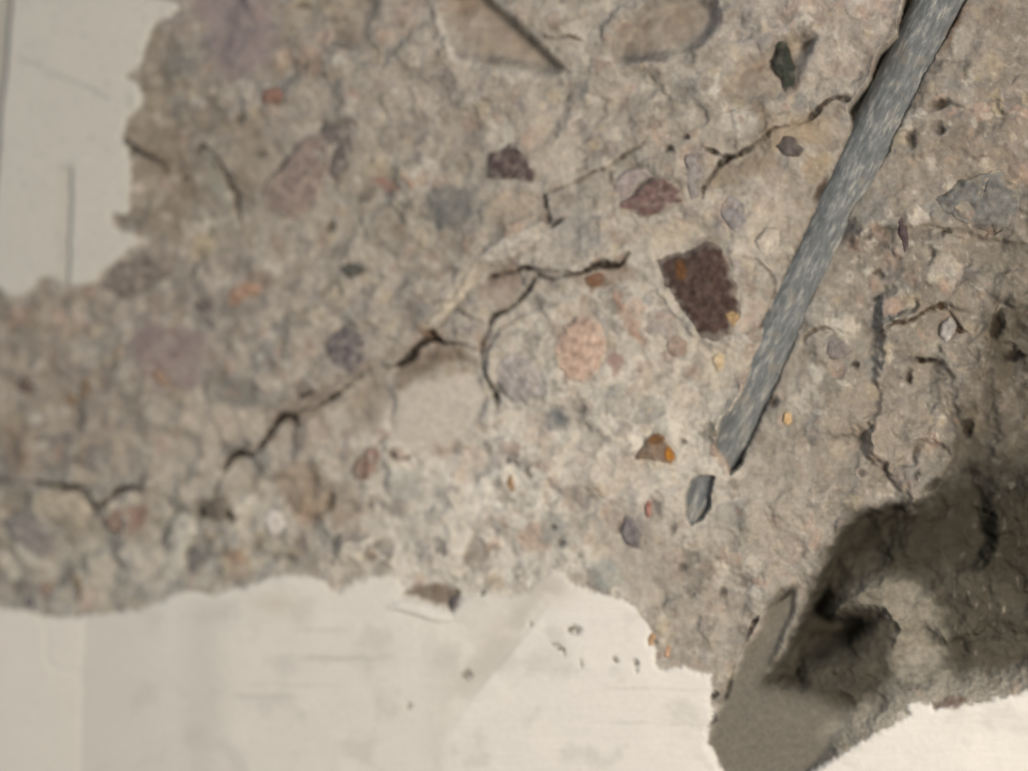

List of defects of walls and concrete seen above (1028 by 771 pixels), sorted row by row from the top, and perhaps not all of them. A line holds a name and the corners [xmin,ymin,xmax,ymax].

crack [702,132,770,190]
spalling [475,227,540,266]
crack [582,261,623,273]
spalling [657,241,741,342]
crack [226,385,348,466]
crack [396,330,444,367]
spalling [389,367,490,453]
crack [481,266,541,403]
spalling [496,351,545,407]
spalling [554,315,607,384]
water stain [831,485,1028,583]
spalling [761,426,1028,757]